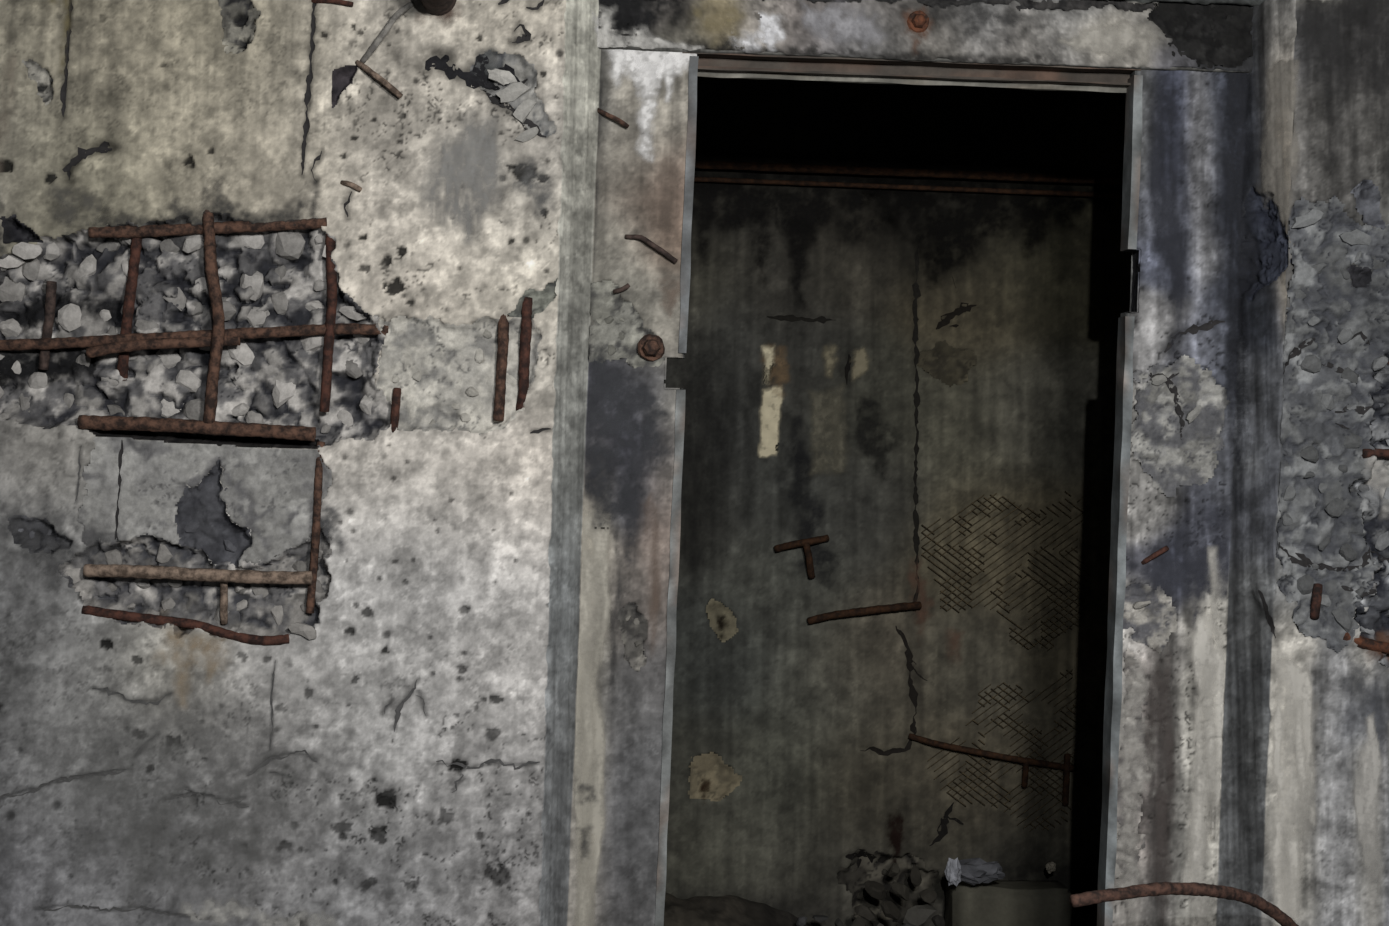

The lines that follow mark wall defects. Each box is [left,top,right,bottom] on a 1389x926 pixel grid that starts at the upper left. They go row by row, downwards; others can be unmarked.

damp [1262,60,1299,226]
spalling [0,210,558,646]
crack [860,243,977,756]
damp [1225,293,1249,429]
spalling [1239,180,1389,667]
damp [1366,456,1389,514]
crack [929,802,964,846]
damp [1114,659,1156,919]
damp [1183,540,1229,926]
damp [1267,661,1315,926]
damp [1354,716,1382,867]